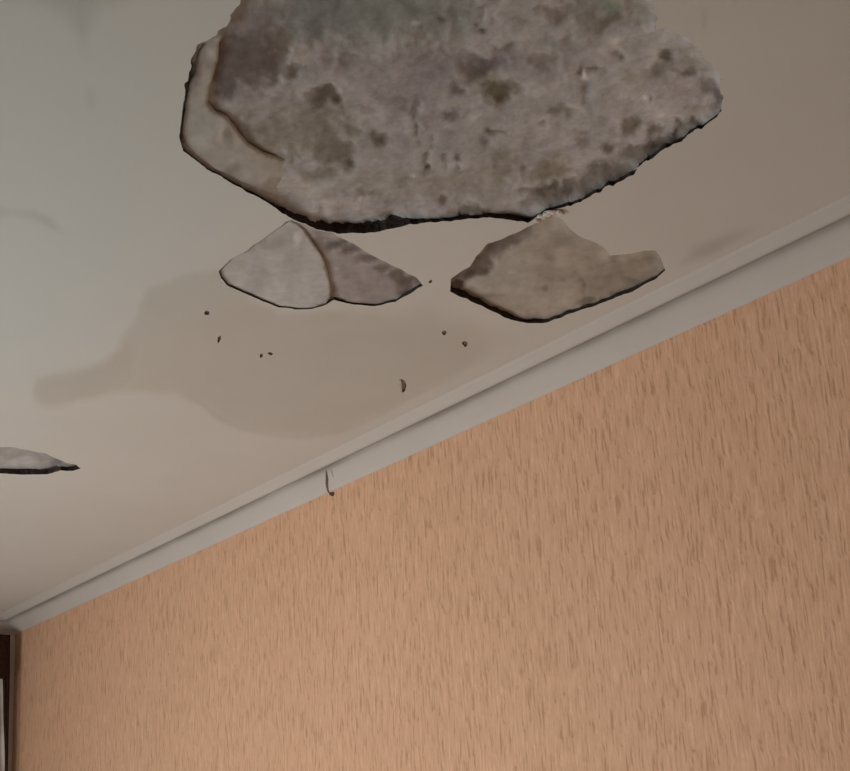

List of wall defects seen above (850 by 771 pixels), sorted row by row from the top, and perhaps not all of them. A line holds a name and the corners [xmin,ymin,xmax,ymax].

spalling [179,0,723,323]
flaking render [0,447,81,475]